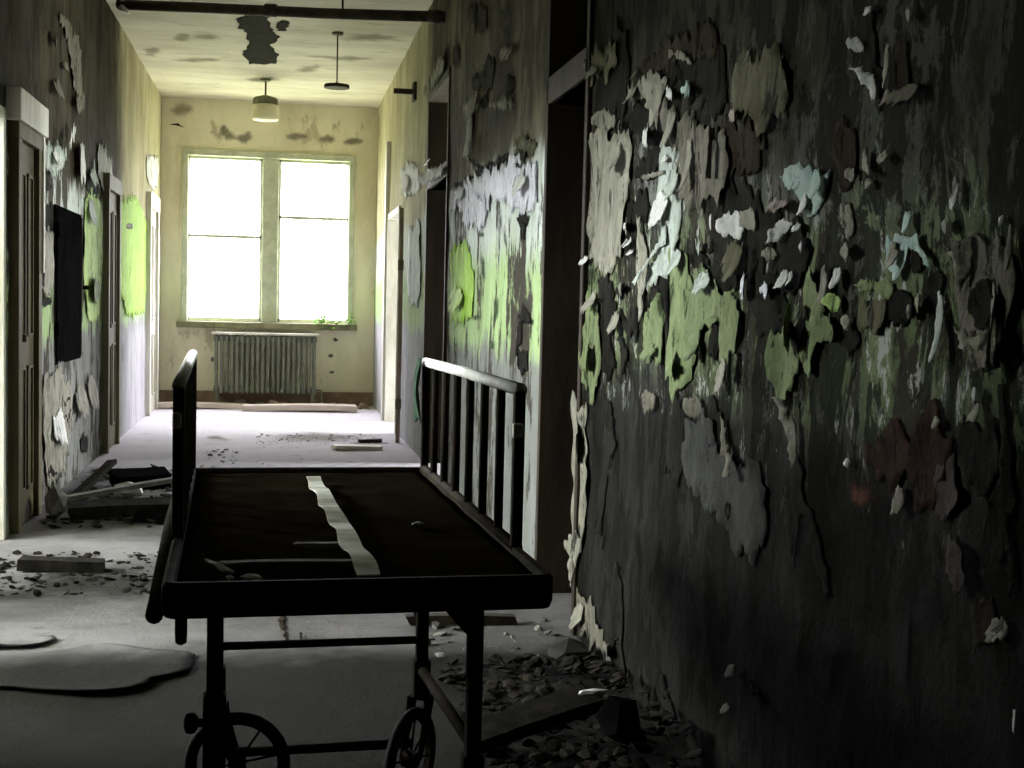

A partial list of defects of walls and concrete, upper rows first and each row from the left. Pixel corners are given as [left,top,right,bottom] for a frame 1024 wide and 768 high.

spalling [236,15,290,65]
peeling [42,11,112,323]
peeling [121,191,148,320]
water stain [222,126,250,142]
peeling [400,159,443,201]
peeling [448,134,537,328]
spalling [515,303,533,377]
peeling [564,5,930,661]
spalling [928,174,1016,382]
peeling [42,365,100,490]
spalling [864,387,1003,596]
spalling [970,594,1008,654]